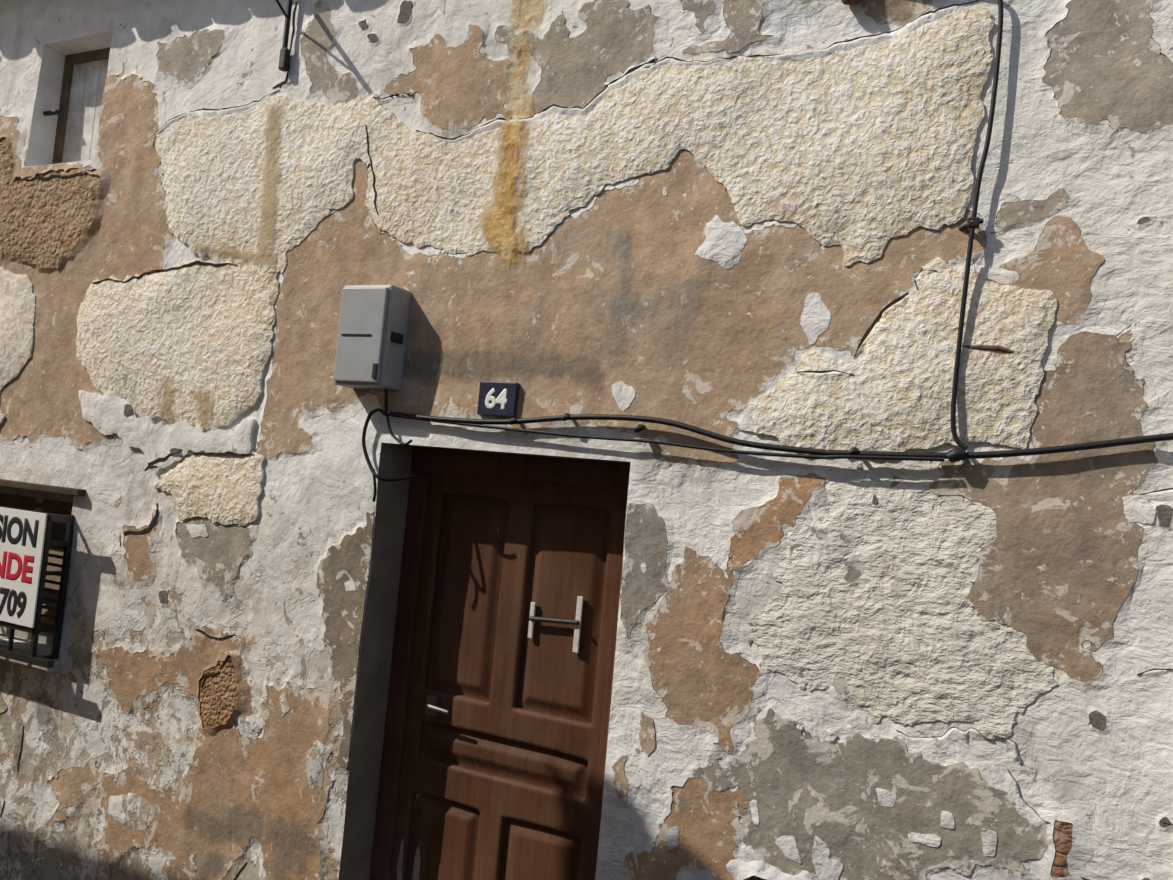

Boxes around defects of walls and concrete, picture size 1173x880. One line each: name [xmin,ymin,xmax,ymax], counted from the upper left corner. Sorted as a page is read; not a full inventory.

peeling [0,20,238,454]
rust [479,0,546,266]
peeling [256,149,1173,692]
peeling [41,499,375,880]
peeling [397,837,420,880]
peeling [605,463,1093,880]
spalling [1085,706,1113,735]
spalling [1155,813,1173,832]